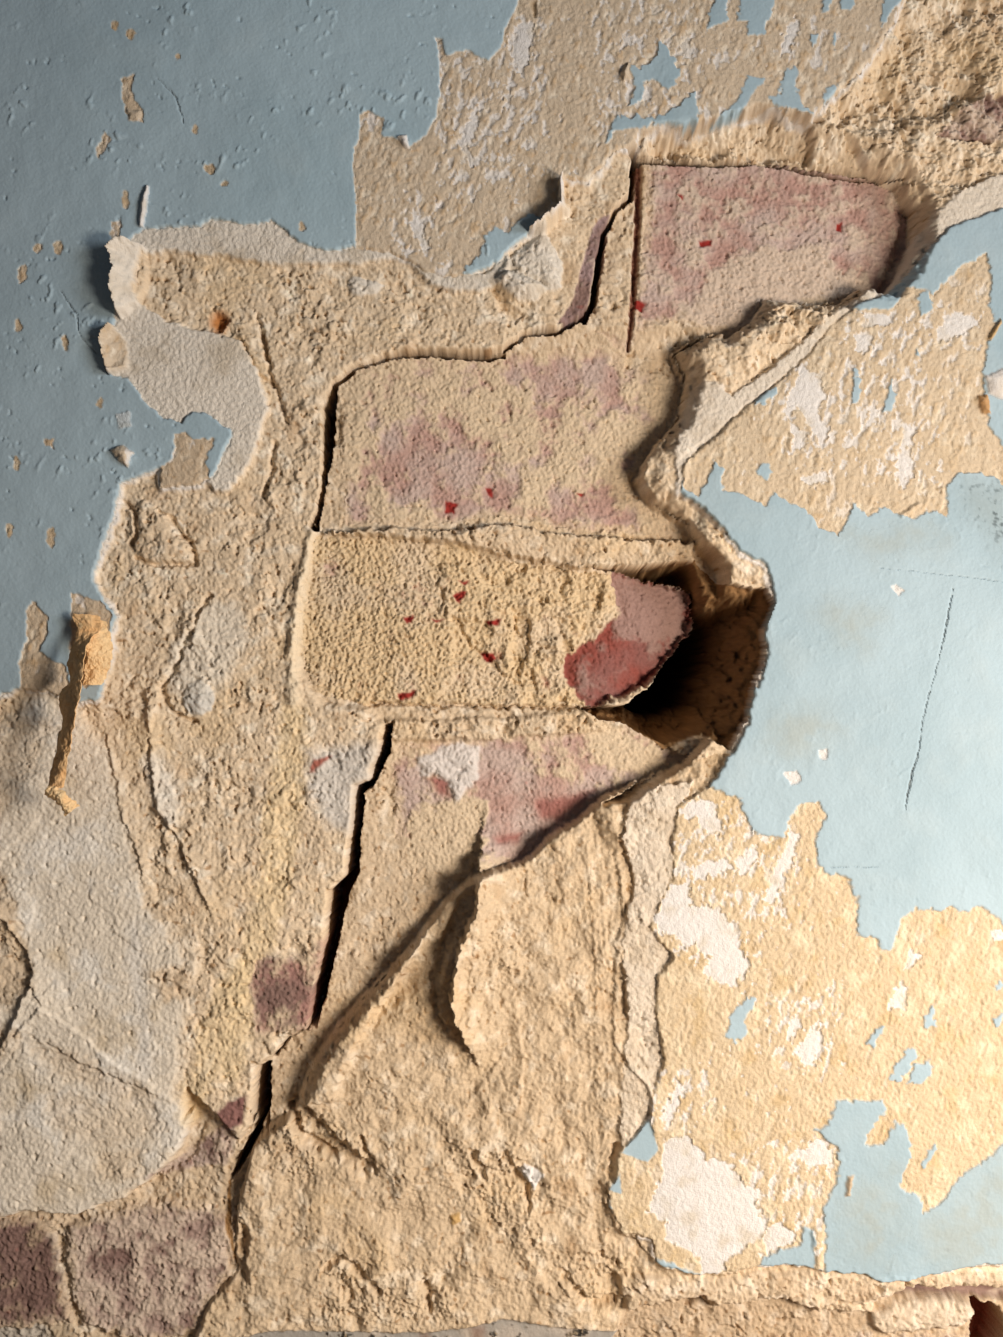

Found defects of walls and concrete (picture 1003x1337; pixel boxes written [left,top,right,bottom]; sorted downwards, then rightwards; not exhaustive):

peeling [97,0,1003,493]
crack [311,150,900,537]
crack [935,133,993,146]
crack [226,724,393,1265]
flaking render [0,149,631,1337]
flaking render [196,164,1003,1337]
crack [879,568,1003,811]